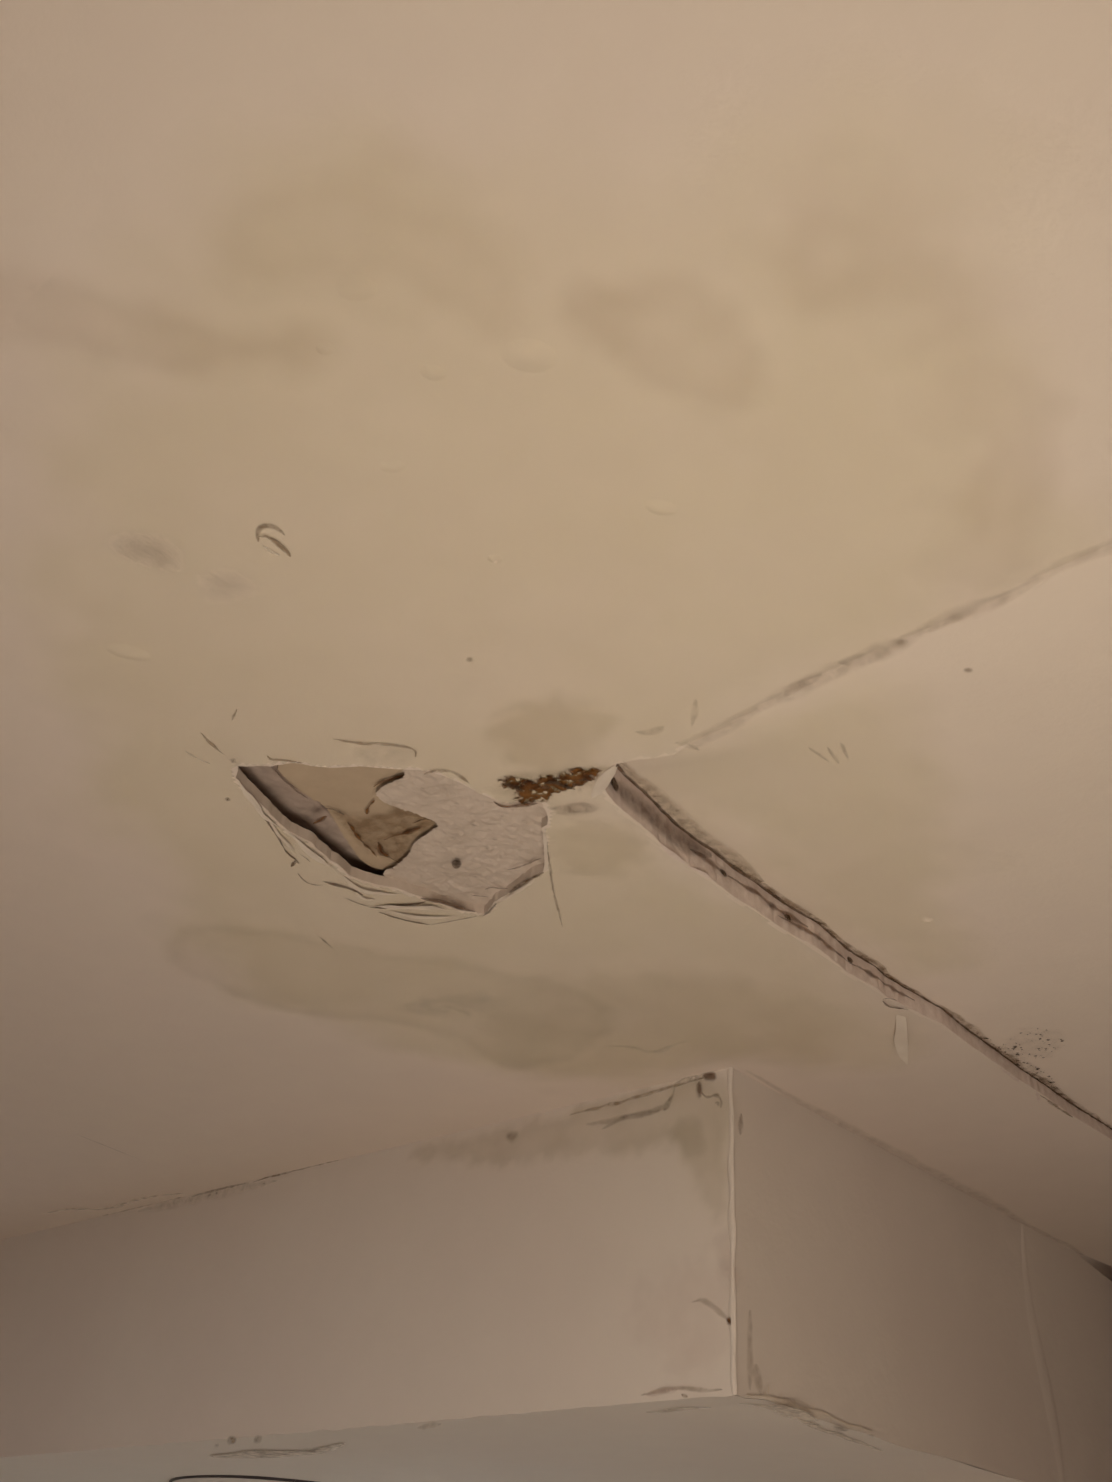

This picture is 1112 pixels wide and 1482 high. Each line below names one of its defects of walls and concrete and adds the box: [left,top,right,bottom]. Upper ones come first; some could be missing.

spalling [236,740,548,925]
corrosion [494,768,601,808]
crack [571,764,1112,1140]